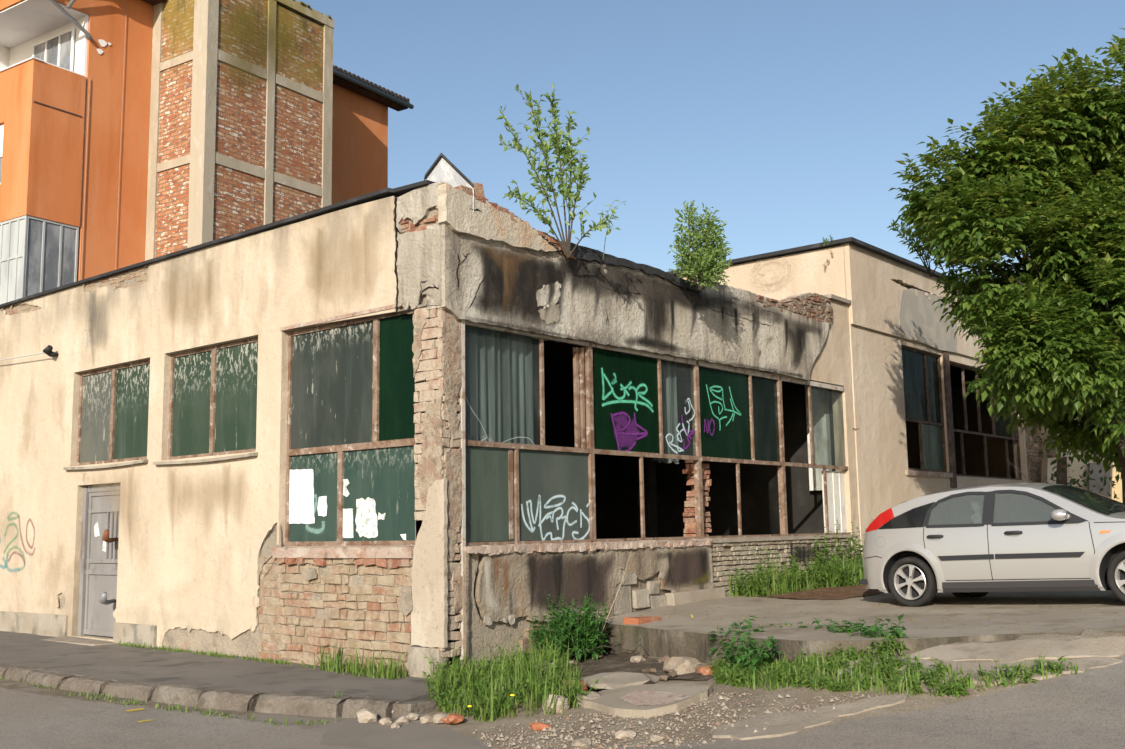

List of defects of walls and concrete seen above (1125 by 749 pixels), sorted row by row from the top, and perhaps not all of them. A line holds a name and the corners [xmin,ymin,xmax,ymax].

flaking render [400,196,449,233]
crack [394,197,485,314]
peeling [536,281,561,325]
leakage [478,248,816,377]
flaking render [398,296,462,520]
flaking render [163,525,413,675]
flaking render [439,527,556,672]
flaking render [613,570,676,616]